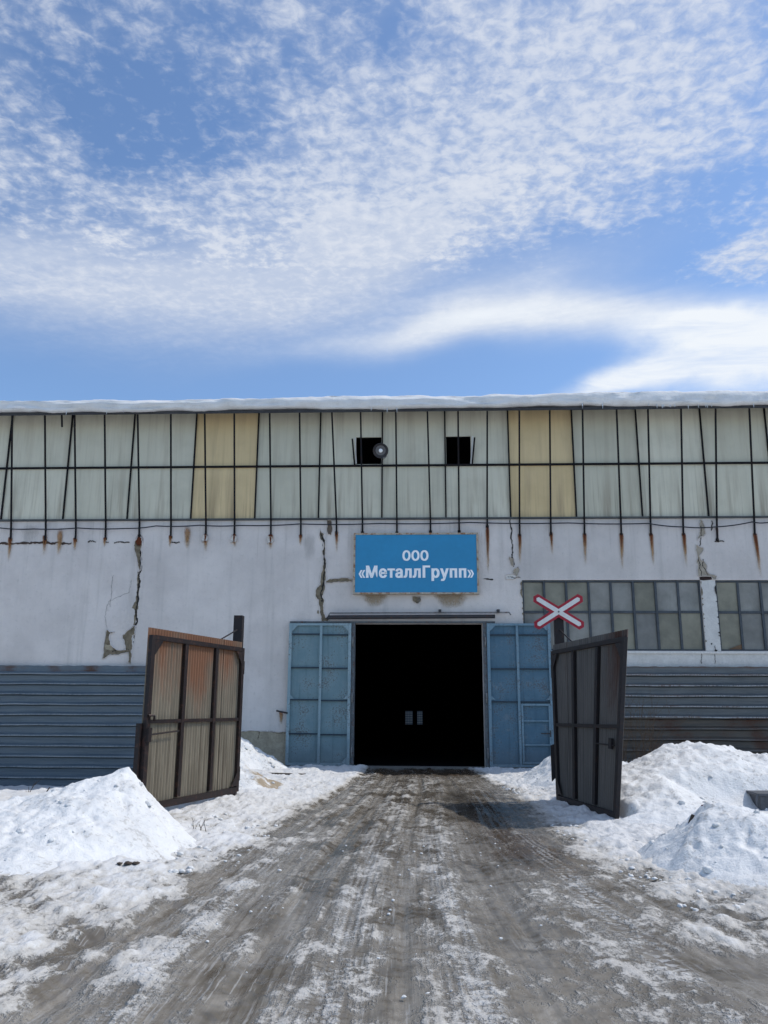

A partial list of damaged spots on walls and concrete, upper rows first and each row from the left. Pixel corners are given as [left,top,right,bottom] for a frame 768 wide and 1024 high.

corrosion [43,531,77,551]
crack [0,536,143,642]
crack [314,529,352,621]
flaking render [102,625,136,664]